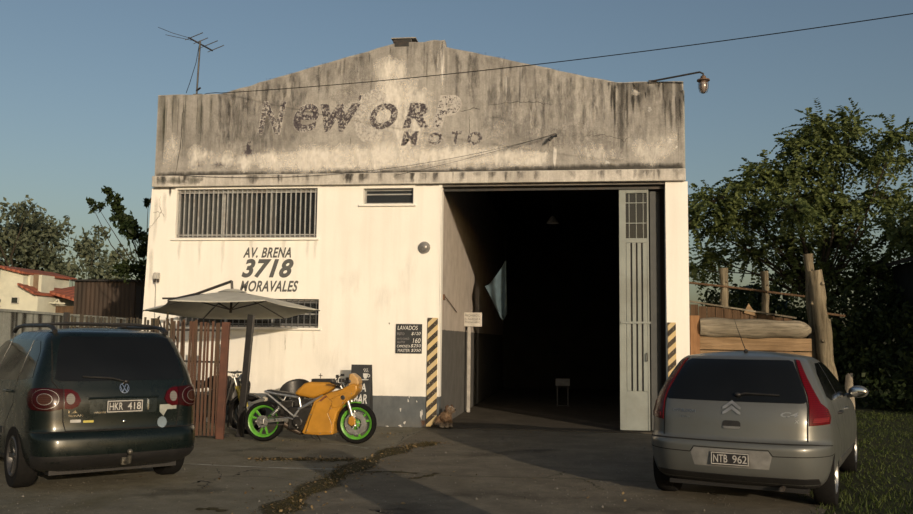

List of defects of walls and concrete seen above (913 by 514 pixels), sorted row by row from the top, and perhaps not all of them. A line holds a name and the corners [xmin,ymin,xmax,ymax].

water stain [611,82,646,125]
water stain [154,147,682,194]